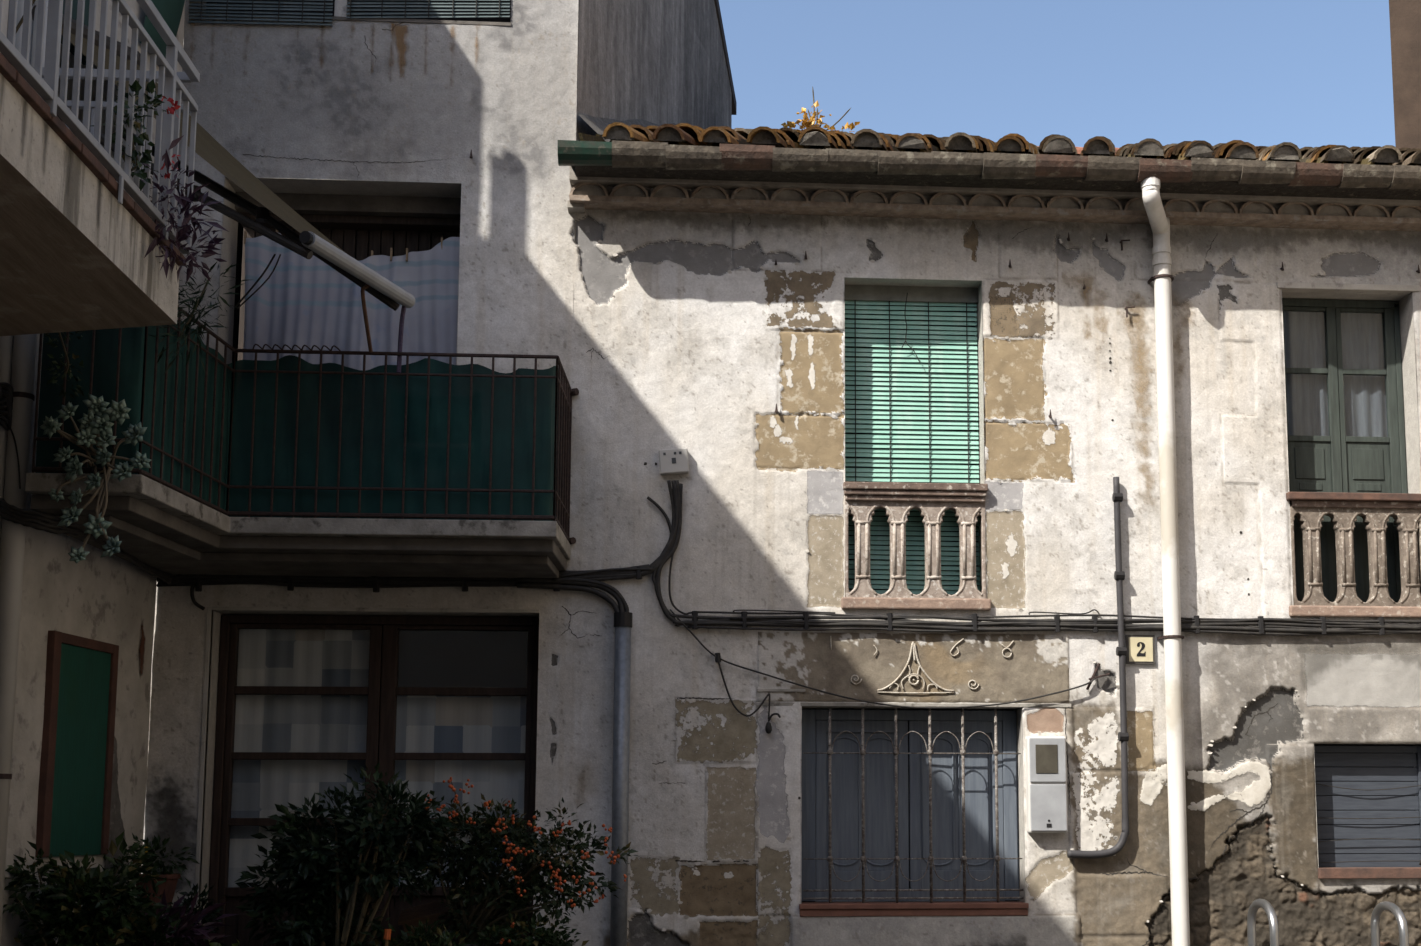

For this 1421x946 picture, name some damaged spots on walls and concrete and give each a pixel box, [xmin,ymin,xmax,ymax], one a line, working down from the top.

peeling [571,215,844,472]
peeling [982,281,1075,483]
peeling [1171,258,1249,310]
peeling [1311,250,1381,277]
flaking render [1093,661,1120,695]
leakage [151,779,197,890]
peeling [627,699,801,946]
peeling [1025,707,1168,901]
flaking render [1187,688,1303,811]